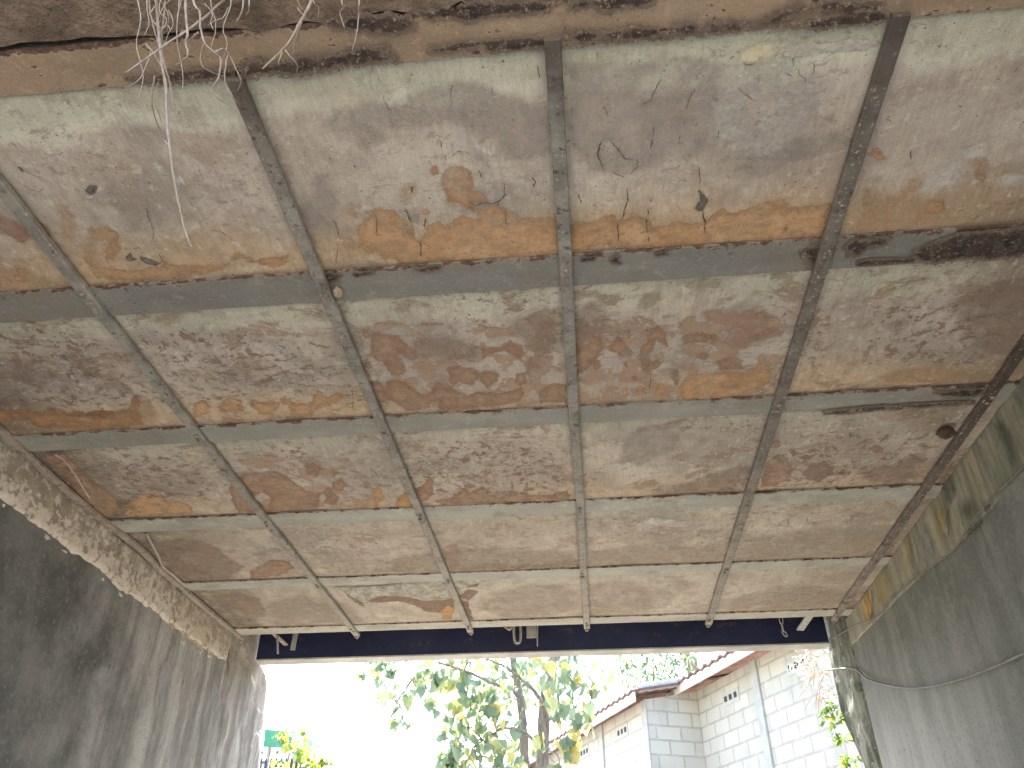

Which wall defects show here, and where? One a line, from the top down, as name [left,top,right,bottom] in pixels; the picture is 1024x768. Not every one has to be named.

corrosion [122,0,890,87]
crack [574,78,661,242]
spalling [695,190,708,211]
spalling [126,253,159,265]
corrosion [571,199,831,270]
corrosion [832,225,1024,267]
corrosion [821,387,986,415]
corrosion [768,431,927,486]